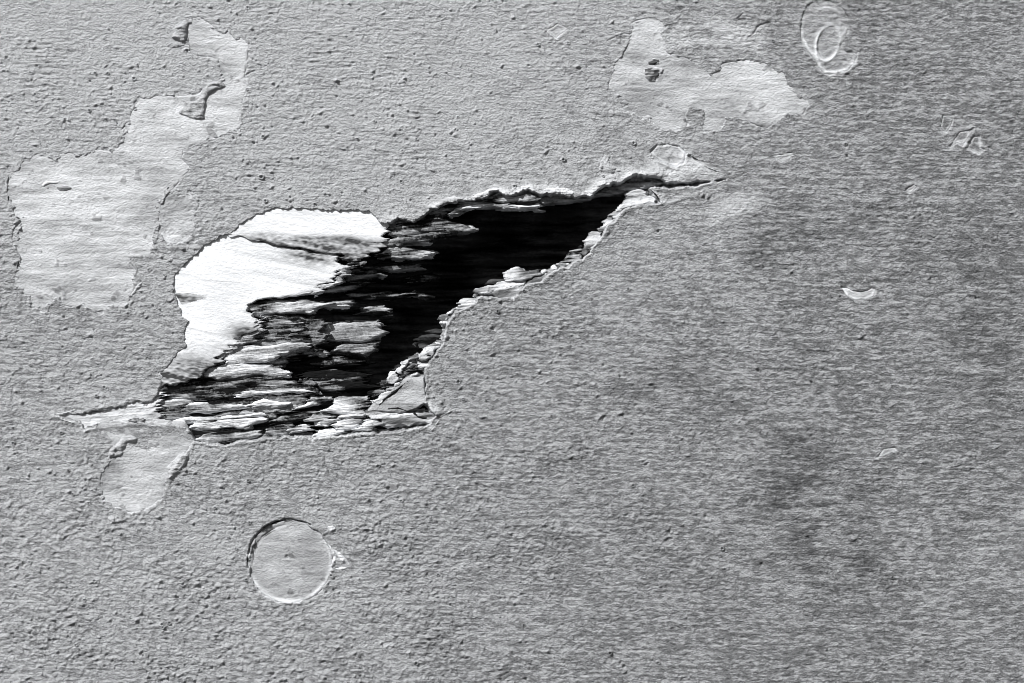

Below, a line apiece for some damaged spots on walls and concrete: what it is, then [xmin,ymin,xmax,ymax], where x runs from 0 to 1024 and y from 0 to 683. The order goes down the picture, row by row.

peeling [7,18,253,312]
spalling [281,144,699,434]
peeling [609,17,814,131]
peeling [92,377,212,512]